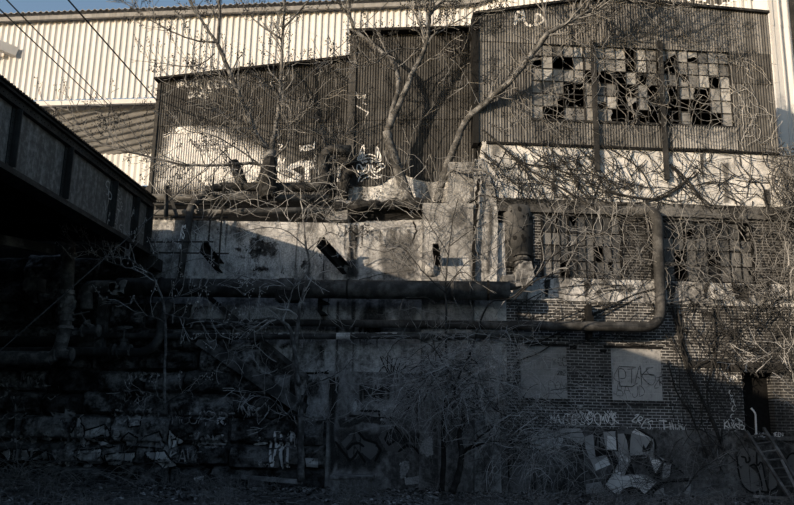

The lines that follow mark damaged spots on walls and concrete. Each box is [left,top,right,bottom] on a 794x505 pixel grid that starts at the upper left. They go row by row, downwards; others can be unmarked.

damp [191,220,333,273]